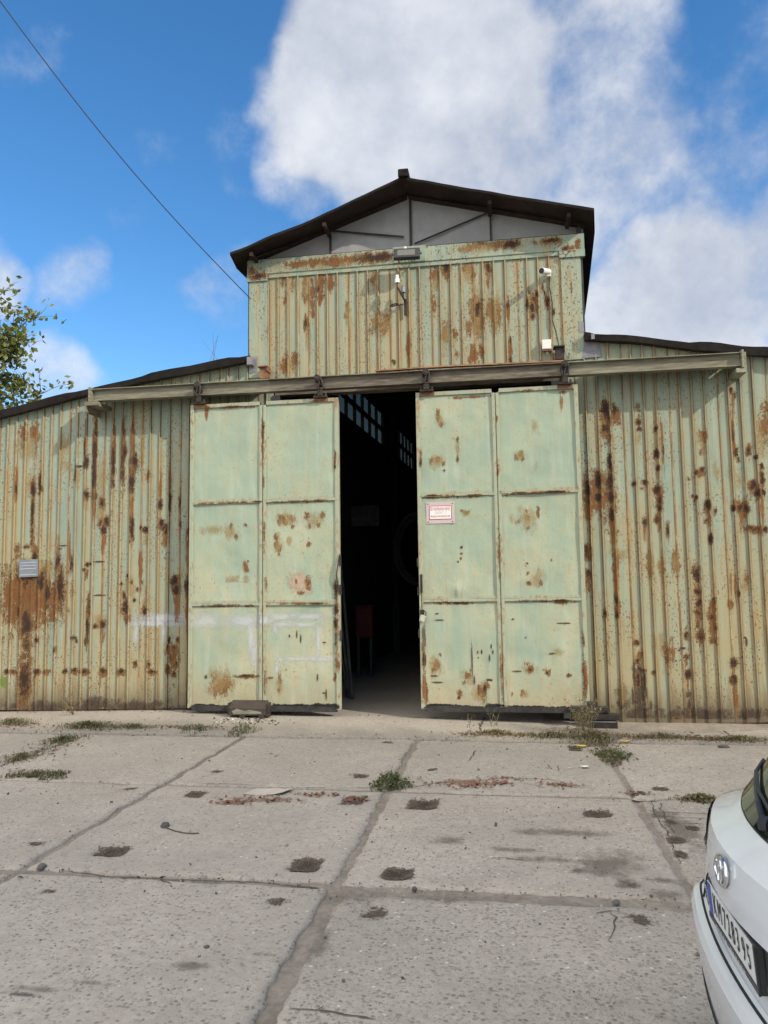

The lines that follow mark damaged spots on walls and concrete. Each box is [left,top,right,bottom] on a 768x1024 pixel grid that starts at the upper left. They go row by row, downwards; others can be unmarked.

rust [248,250,393,343]
rust [429,236,581,364]
rust [83,416,135,545]
rust [0,466,254,710]
rust [204,670,282,697]
rust [198,499,326,555]
rust [265,577,340,681]
rust [422,625,443,704]
rust [456,653,551,703]
rust [499,393,625,621]
rust [617,403,734,716]
rust [702,397,768,546]